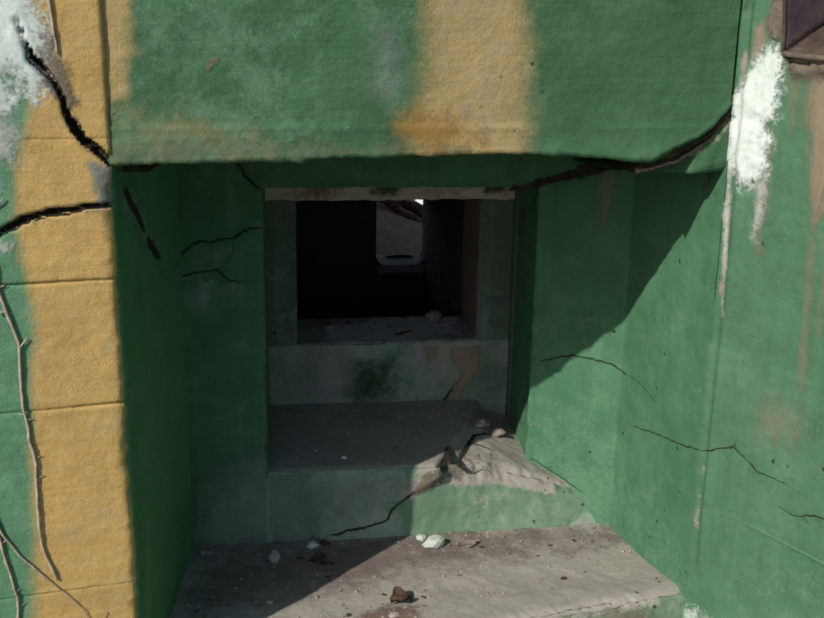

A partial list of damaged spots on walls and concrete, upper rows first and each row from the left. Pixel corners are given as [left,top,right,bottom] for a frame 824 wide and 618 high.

leakage [0,0,78,163]
crack [16,25,109,165]
crack [509,112,730,191]
leakage [721,44,798,309]
rust [806,74,824,229]
crack [0,200,112,236]
leakage [302,316,465,398]
crack [542,354,656,402]
crack [441,432,500,478]
crack [633,426,788,485]
crack [330,489,417,536]
crack [778,506,824,524]